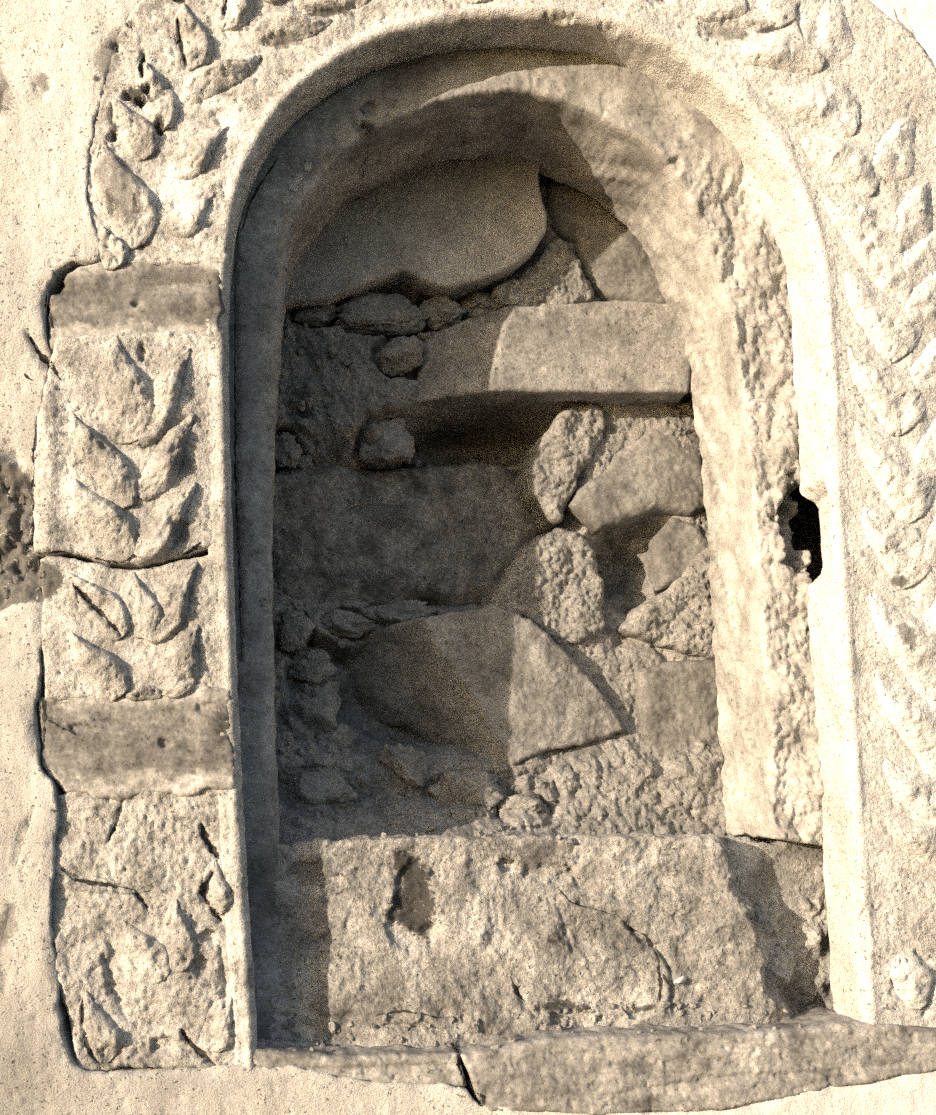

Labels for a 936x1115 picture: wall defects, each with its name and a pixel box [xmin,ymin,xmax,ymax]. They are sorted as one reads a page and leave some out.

spalling [0,457,63,610]
crack [31,418,64,558]
crack [94,542,201,570]
crack [377,1010,485,1107]